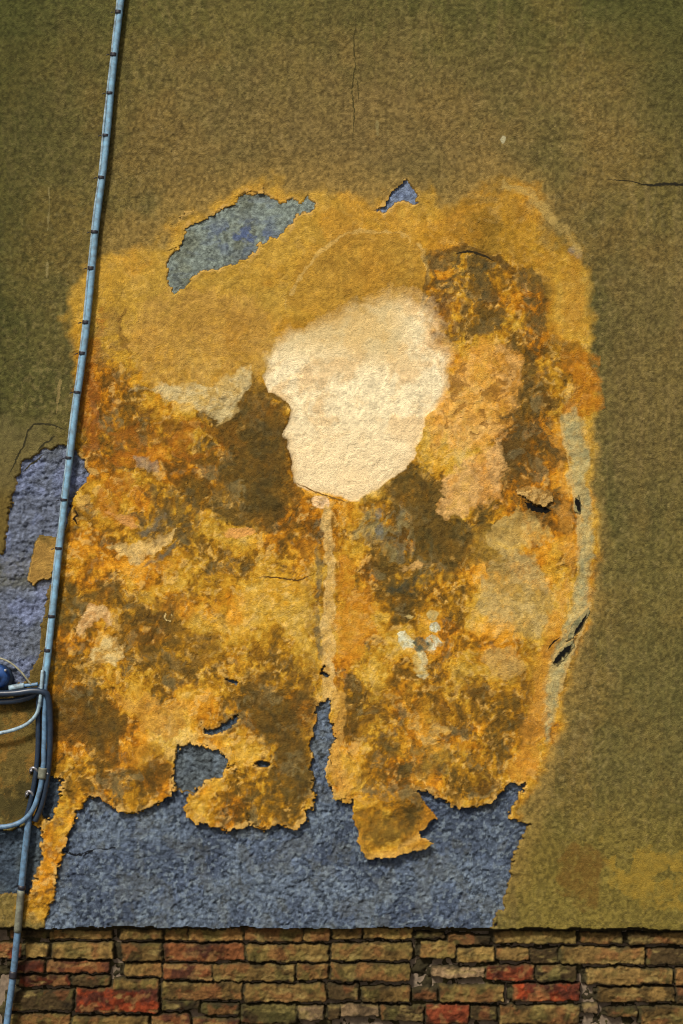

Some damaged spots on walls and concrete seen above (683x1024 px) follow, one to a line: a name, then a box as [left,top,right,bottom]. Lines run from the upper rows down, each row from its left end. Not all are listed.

crack [608,179,683,187]
crack [456,250,494,261]
damp [90,306,135,376]
crack [9,423,68,474]
spalling [0,445,89,685]
damp [99,242,582,809]
flaking render [123,173,598,746]
crack [525,498,581,514]
damp [63,568,230,685]
crack [548,614,587,663]
damp [53,664,175,787]
spalling [0,689,528,929]